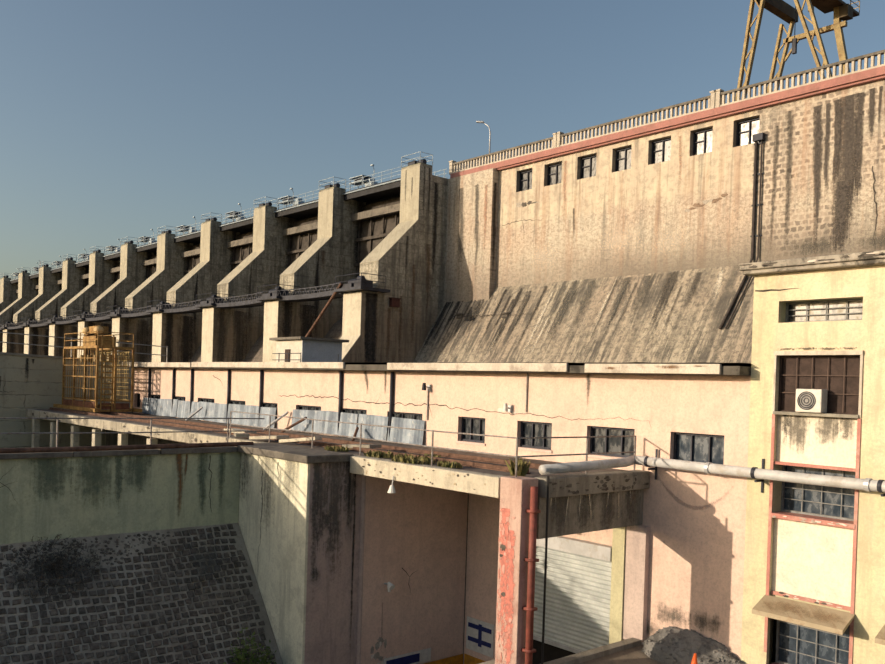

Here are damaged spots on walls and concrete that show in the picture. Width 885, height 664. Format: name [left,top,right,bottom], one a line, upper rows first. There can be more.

water stain [801,86,883,254]
water stain [782,415,806,445]
water stain [819,417,852,441]
peeling [497,508,515,664]